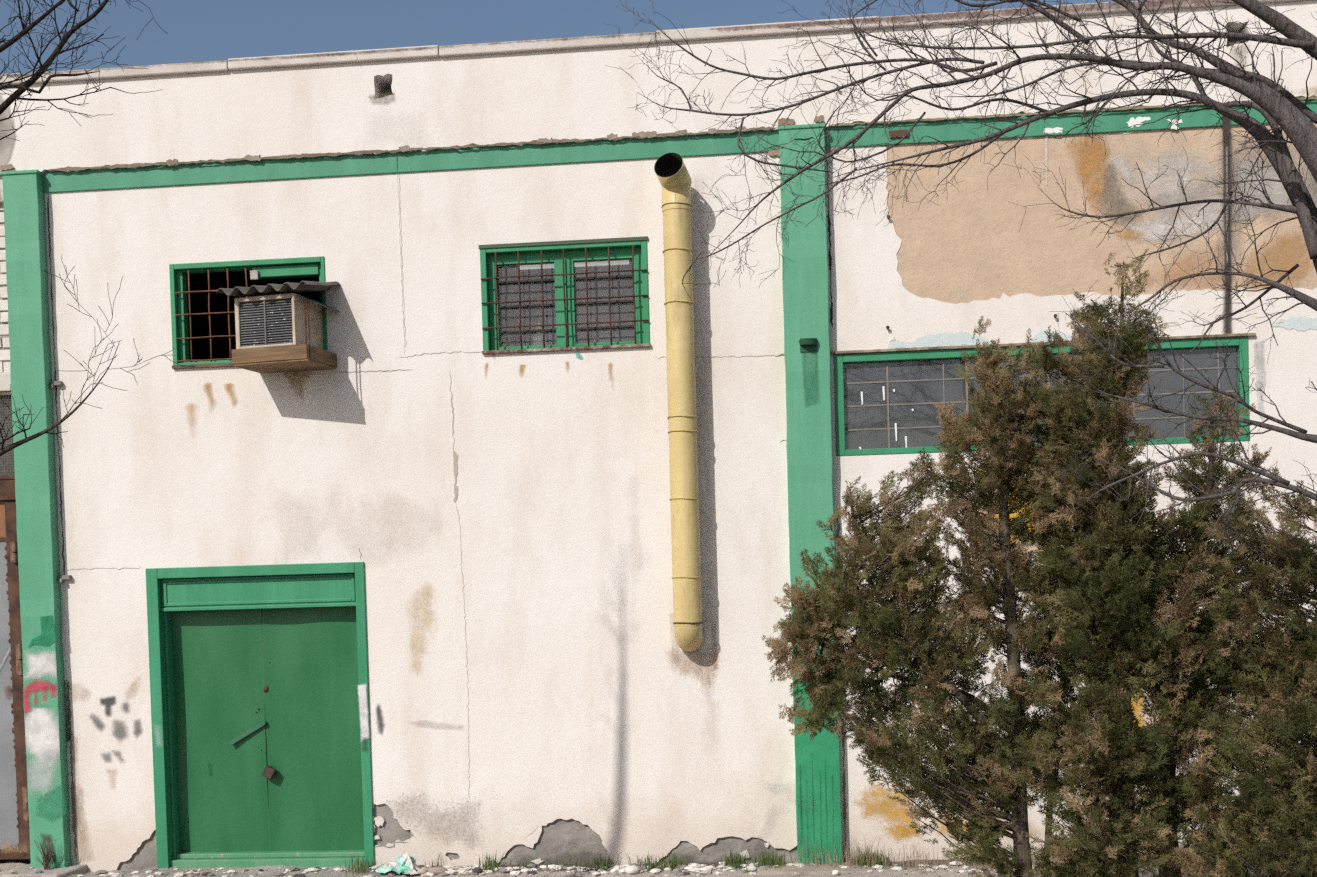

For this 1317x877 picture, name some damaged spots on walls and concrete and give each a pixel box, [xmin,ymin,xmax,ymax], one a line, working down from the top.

spalling [49,117,794,171]
peeling [814,104,1317,304]
crack [338,350,482,795]
spalling [118,830,157,872]
spalling [374,803,414,846]
spalling [496,818,614,866]
spalling [657,836,798,865]
water stain [890,826,910,838]